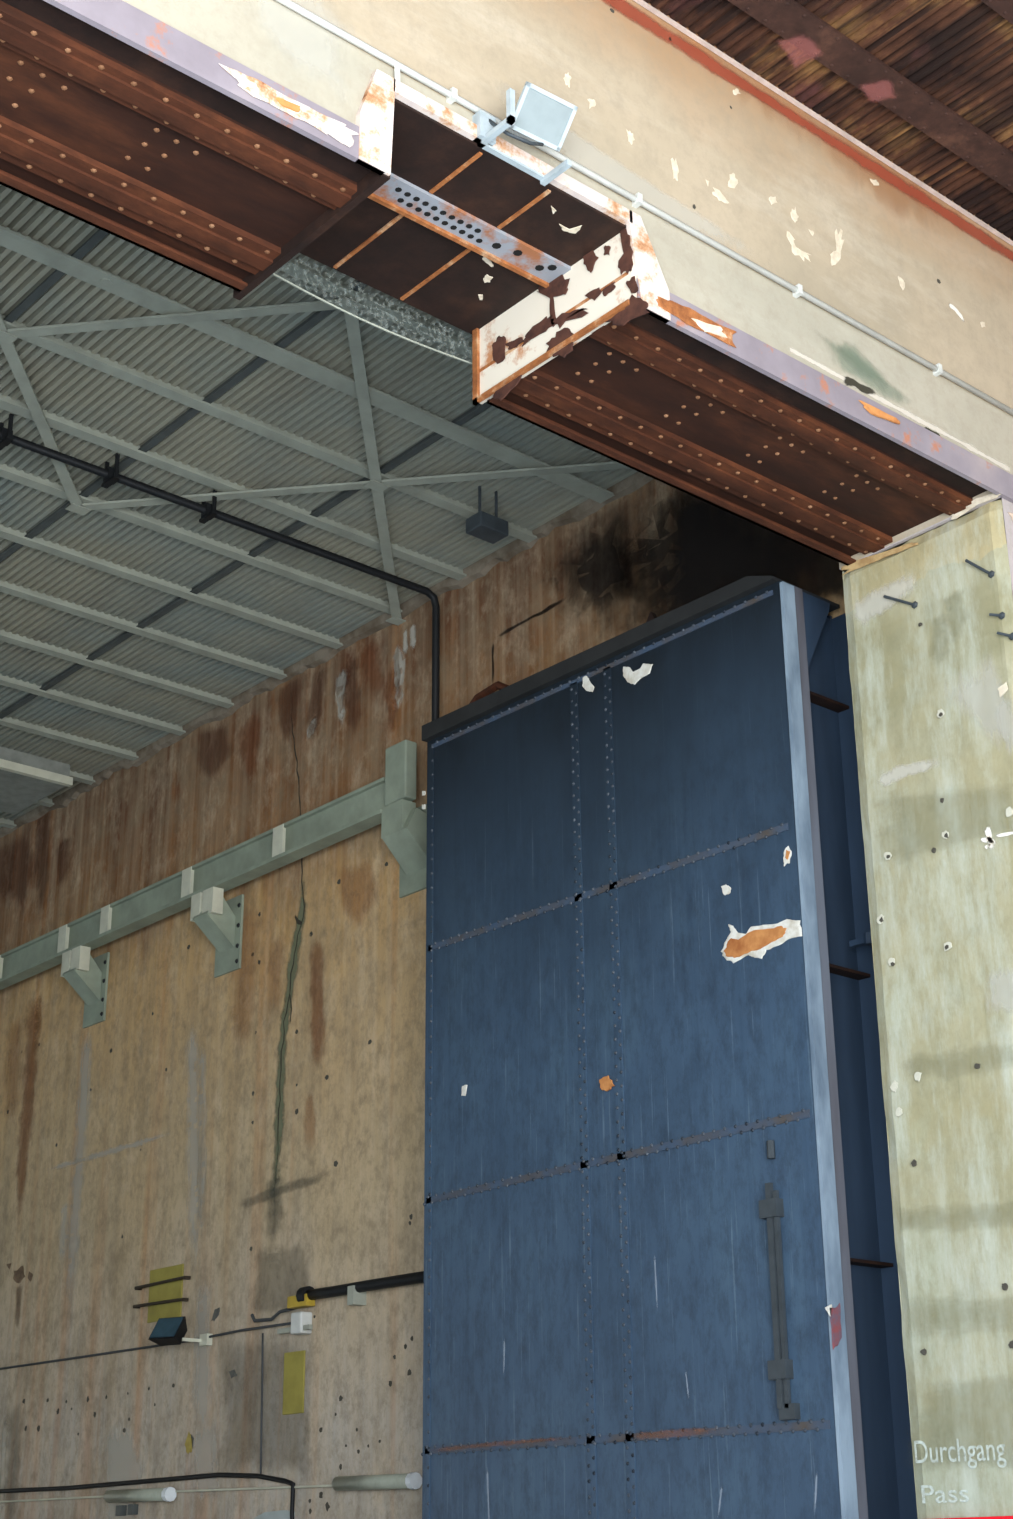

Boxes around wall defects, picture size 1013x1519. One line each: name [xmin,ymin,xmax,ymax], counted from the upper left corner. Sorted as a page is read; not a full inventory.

peeling [551,206,582,234]
peeling [769,196,814,262]
peeling [478,257,494,300]
peeling [492,227,736,364]
peeling [858,400,900,425]
leakage [337,672,346,717]
leakage [395,625,415,702]
peeling [582,676,594,692]
peeling [623,663,653,685]
crack [291,718,301,816]
peeling [721,919,802,963]
crack [273,858,306,1191]